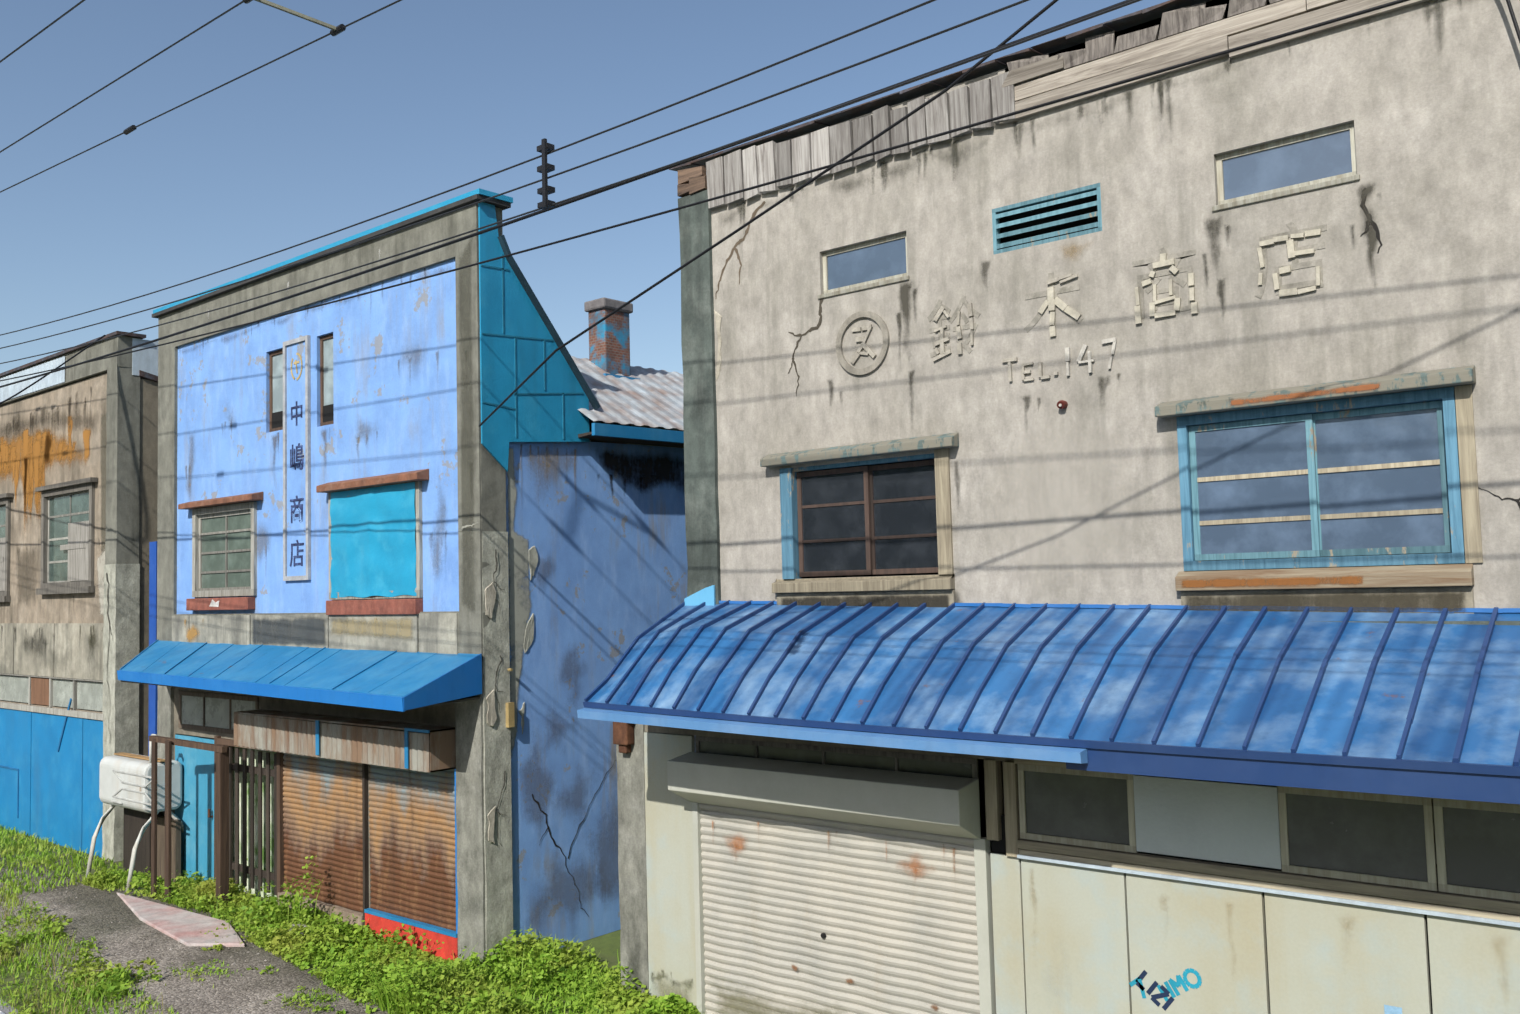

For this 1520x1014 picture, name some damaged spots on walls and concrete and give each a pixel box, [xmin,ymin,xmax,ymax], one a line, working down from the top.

crack [715,201,766,299]
water stain [1204,220,1229,305]
water stain [1352,185,1377,264]
crack [788,298,824,396]
rust [0,416,91,515]
crack [1479,488,1520,508]
peeling [485,448,538,750]
crack [497,760,617,917]